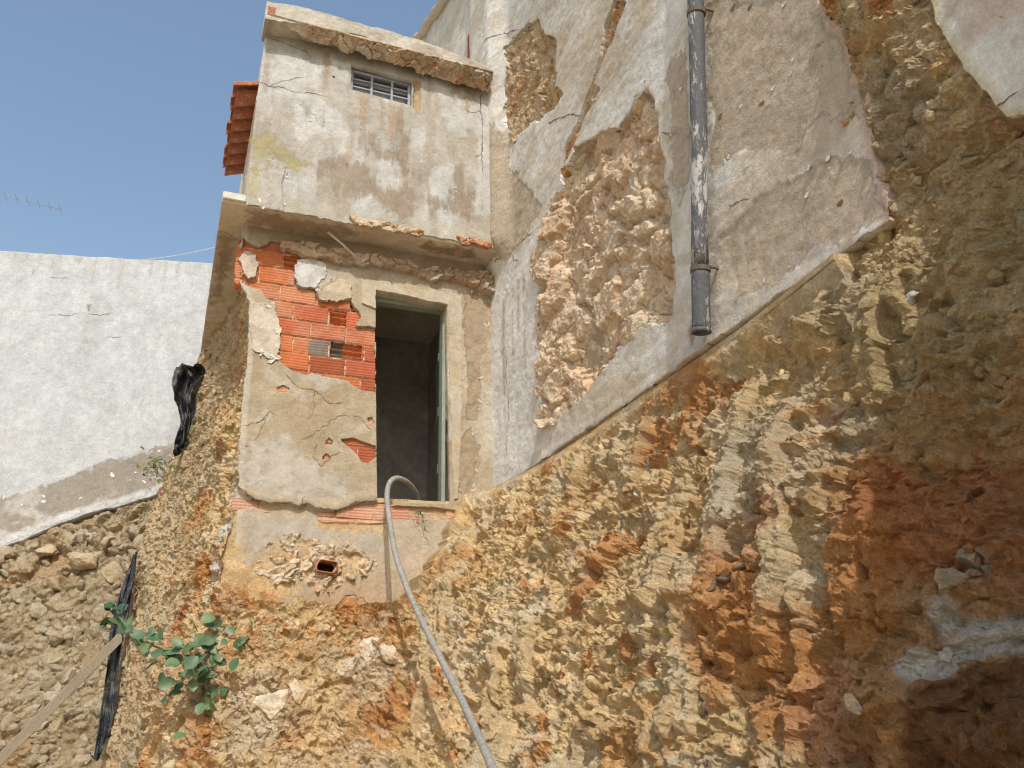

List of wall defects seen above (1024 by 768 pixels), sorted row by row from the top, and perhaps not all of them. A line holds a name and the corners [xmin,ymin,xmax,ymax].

crack [257,37,324,96]
spalling [603,0,626,55]
peeling [706,0,865,172]
spalling [233,13,691,494]
crack [236,411,376,513]
crack [286,374,371,466]
spalling [254,530,377,593]